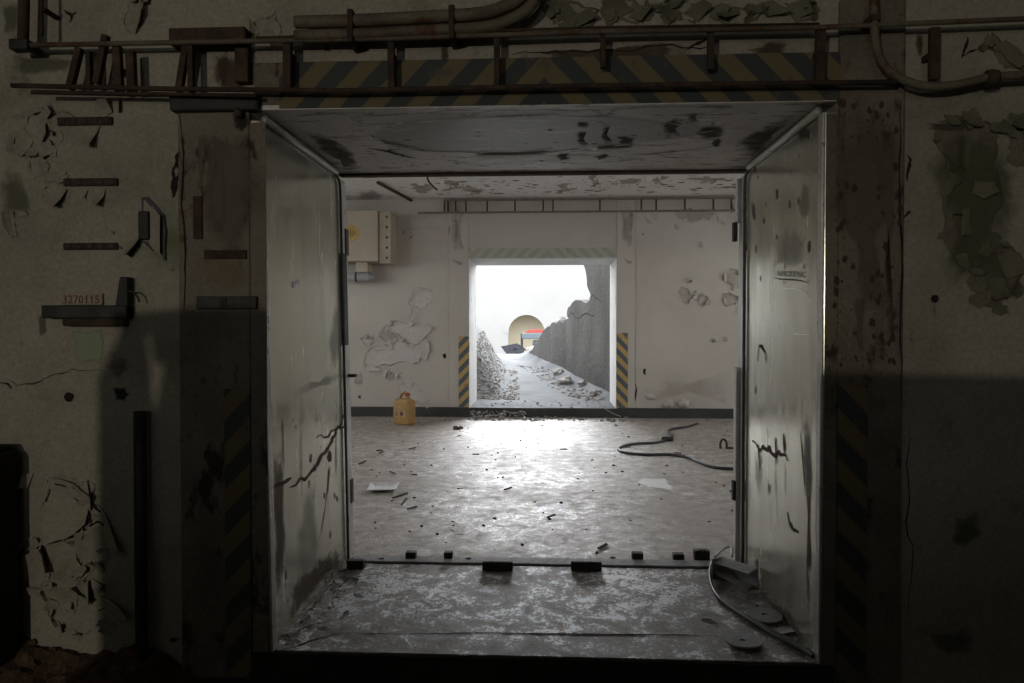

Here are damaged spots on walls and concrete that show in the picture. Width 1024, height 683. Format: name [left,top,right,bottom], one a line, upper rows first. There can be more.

peeling [541,0,820,27]
peeling [6,97,119,210]
peeling [933,107,1024,316]
peeling [677,268,739,314]
crack [0,368,102,389]
peeling [358,320,436,409]
peeling [17,473,127,638]